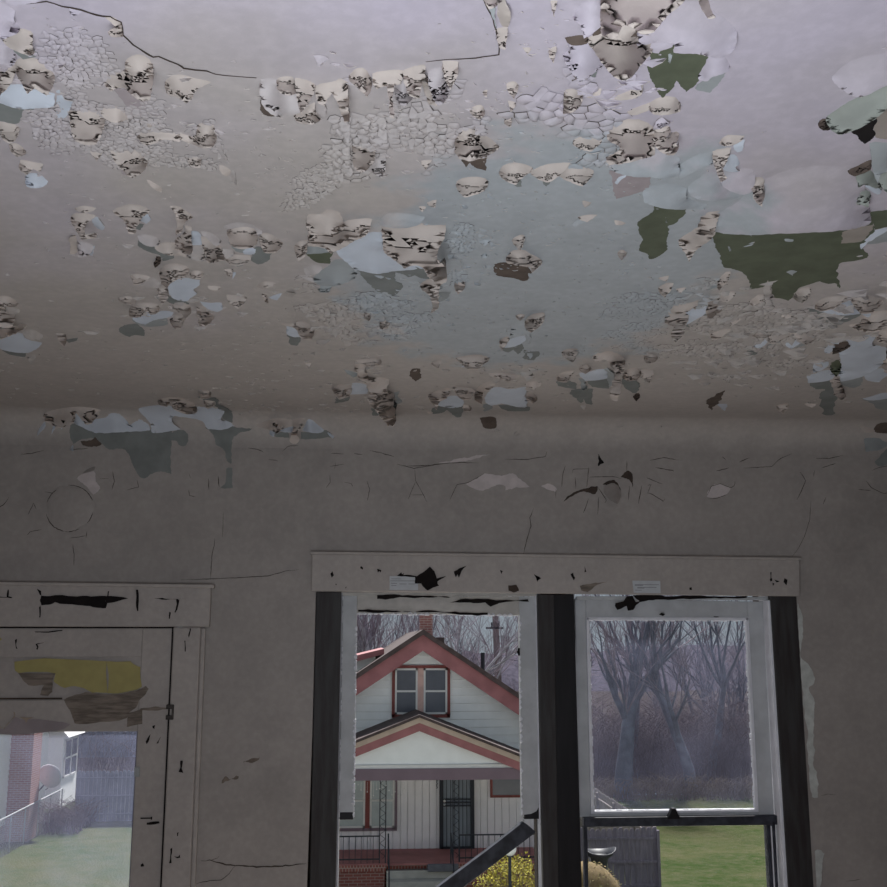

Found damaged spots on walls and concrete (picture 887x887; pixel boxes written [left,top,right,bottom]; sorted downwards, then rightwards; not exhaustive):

crack [5,0,254,78]
crack [428,0,511,62]
peeling [259,61,459,125]
peeling [352,142,386,178]
peeling [454,90,499,198]
peeling [548,0,887,415]
peeling [294,200,465,313]
peeling [332,358,402,426]
peeling [425,312,545,429]
peeling [37,390,334,489]
peeling [40,595,127,608]
peeling [0,658,166,735]